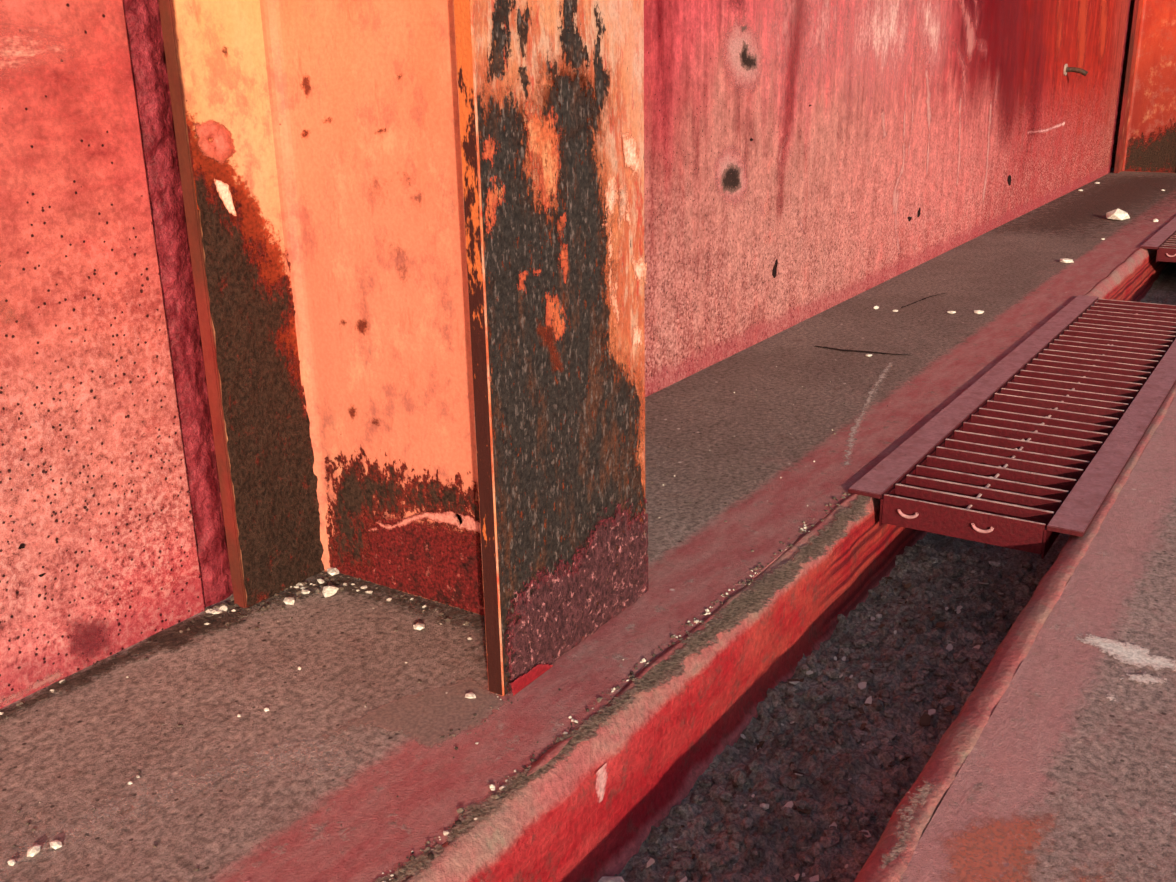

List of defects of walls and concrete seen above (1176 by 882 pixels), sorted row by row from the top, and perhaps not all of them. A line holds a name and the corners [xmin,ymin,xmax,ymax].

rust [185,111,485,616]
rust [477,50,646,592]
damp [760,0,987,253]